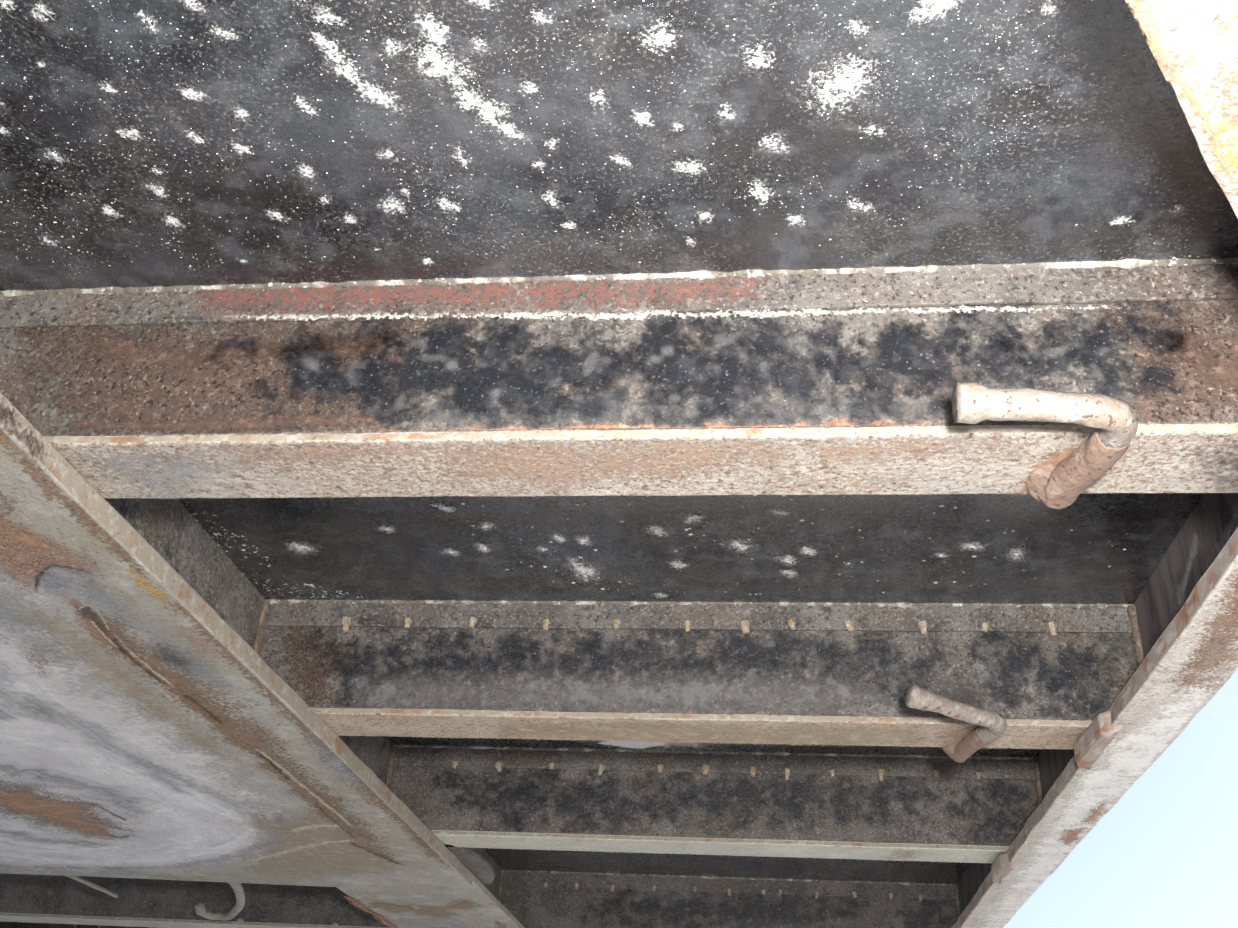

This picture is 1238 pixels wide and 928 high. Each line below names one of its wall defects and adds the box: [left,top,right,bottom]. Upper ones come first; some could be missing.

corrosion [1125,0,1238,176]
damp [224,305,1119,321]
corrosion [0,276,1083,870]
damp [0,562,400,878]
corrosion [1058,804,1105,845]